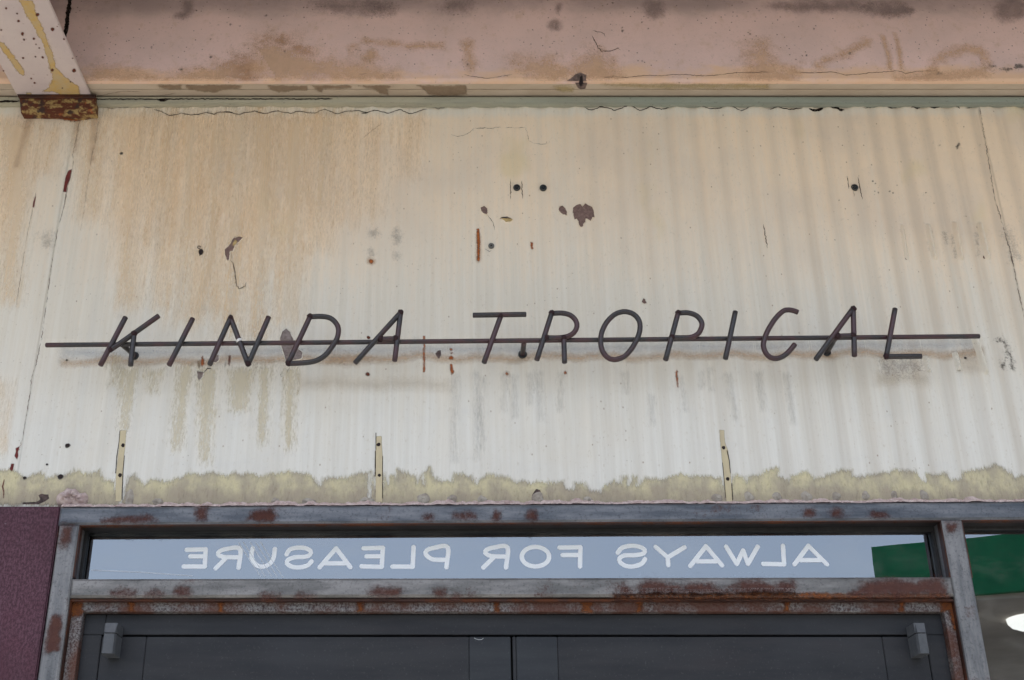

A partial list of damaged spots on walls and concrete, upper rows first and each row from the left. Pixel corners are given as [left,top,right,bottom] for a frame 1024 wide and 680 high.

crack [585,104,667,112]
crack [56,91,440,239]
spalling [558,203,595,228]
crack [705,107,1022,303]
spalling [224,237,244,261]
corrosion [194,506,209,519]
corrosion [248,508,275,522]
corrosion [357,587,402,613]
corrosion [45,603,84,652]